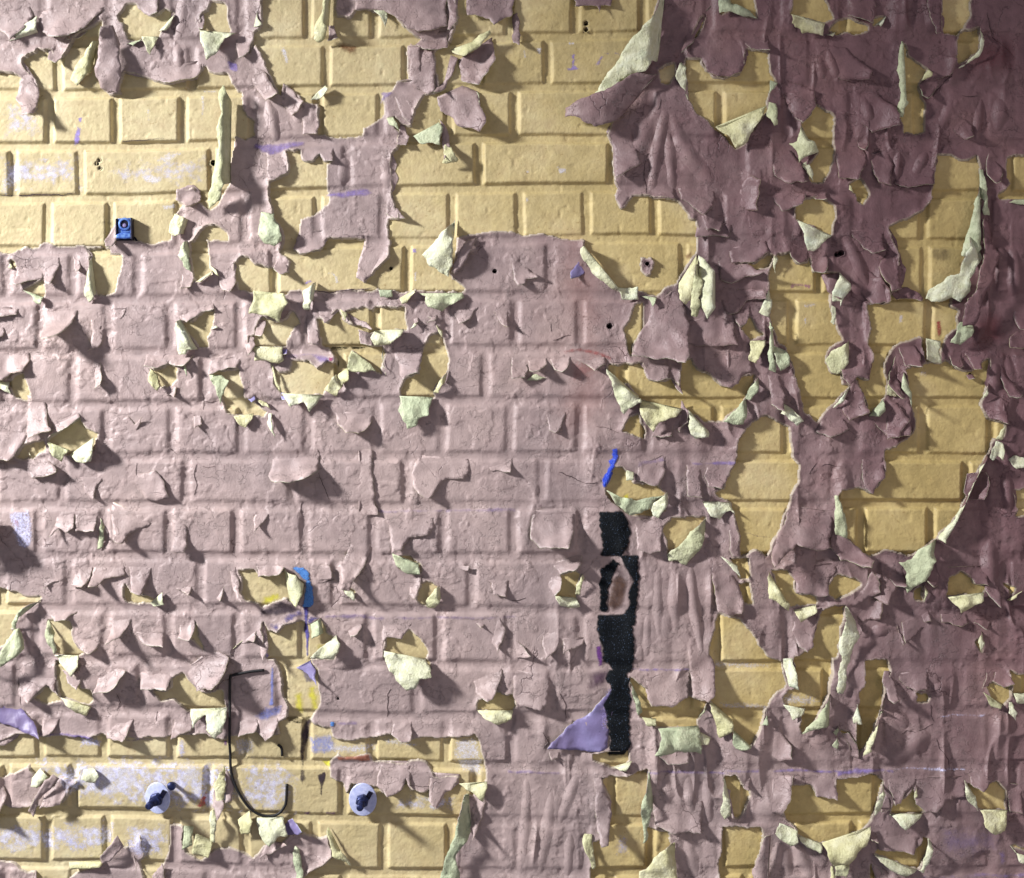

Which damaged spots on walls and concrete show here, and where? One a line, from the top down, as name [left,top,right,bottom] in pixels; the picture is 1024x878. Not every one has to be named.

peeling [0,0,255,302]
peeling [144,304,218,398]
peeling [178,0,1024,765]
peeling [0,566,164,667]
peeling [0,612,488,878]
peeling [547,691,703,878]
peeling [718,770,1023,878]